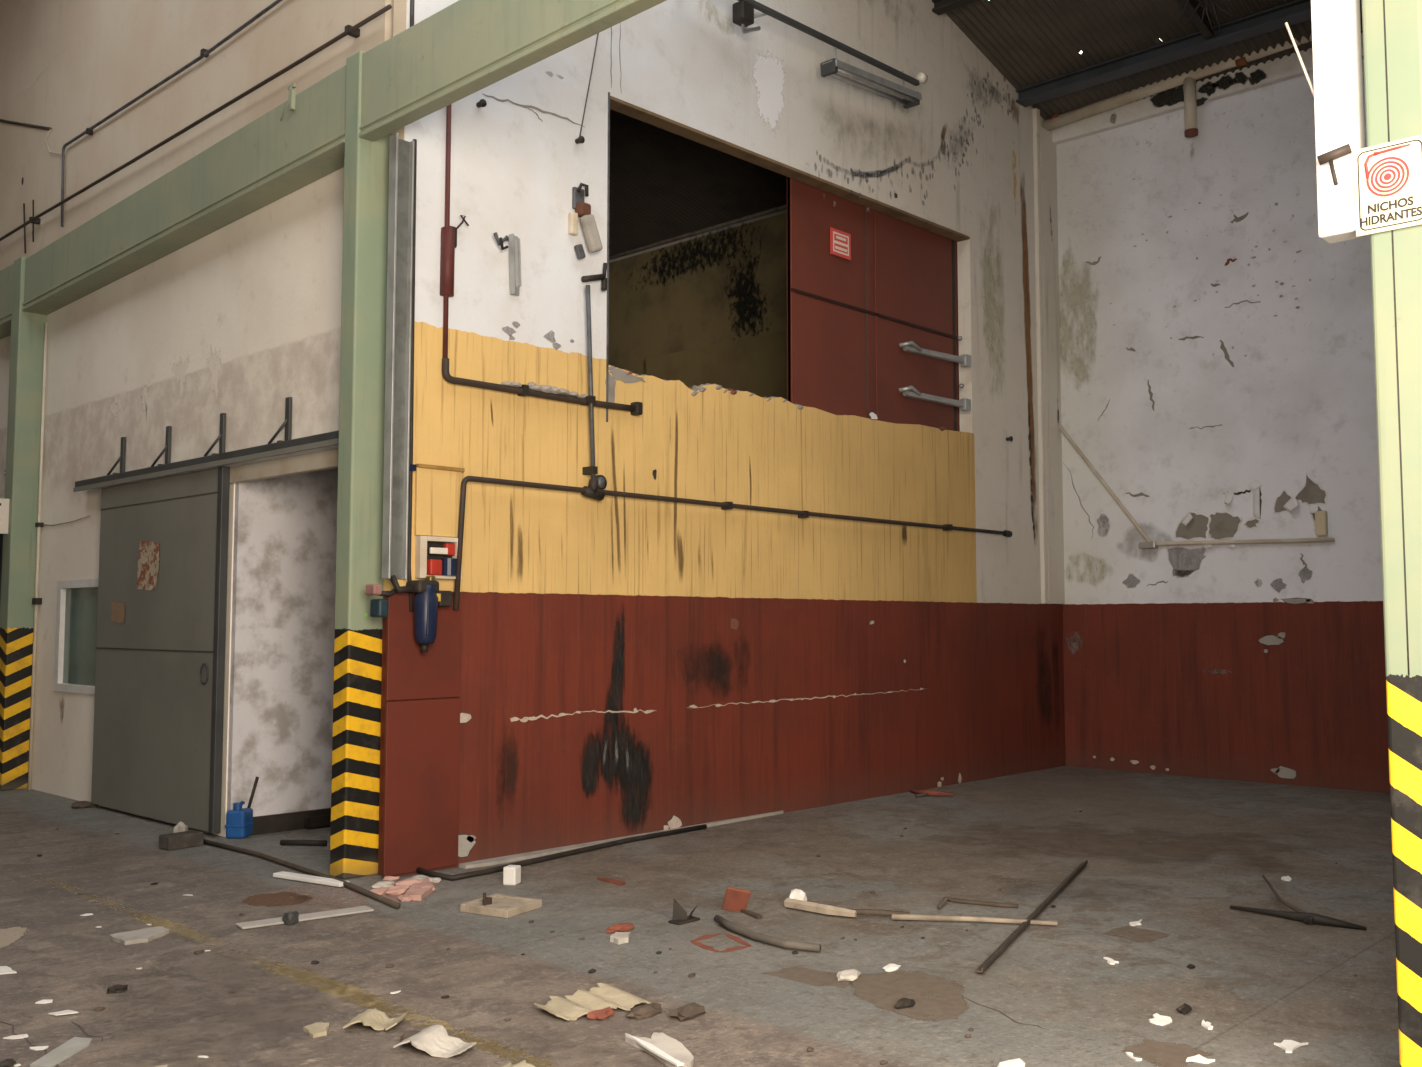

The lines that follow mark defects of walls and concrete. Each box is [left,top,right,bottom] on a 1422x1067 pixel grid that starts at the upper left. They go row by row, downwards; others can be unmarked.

leakage [814,77,1014,212]
spalling [605,366,645,403]
peeling [1168,473,1328,576]
spalling [1258,632,1285,653]
leakage [582,615,651,827]